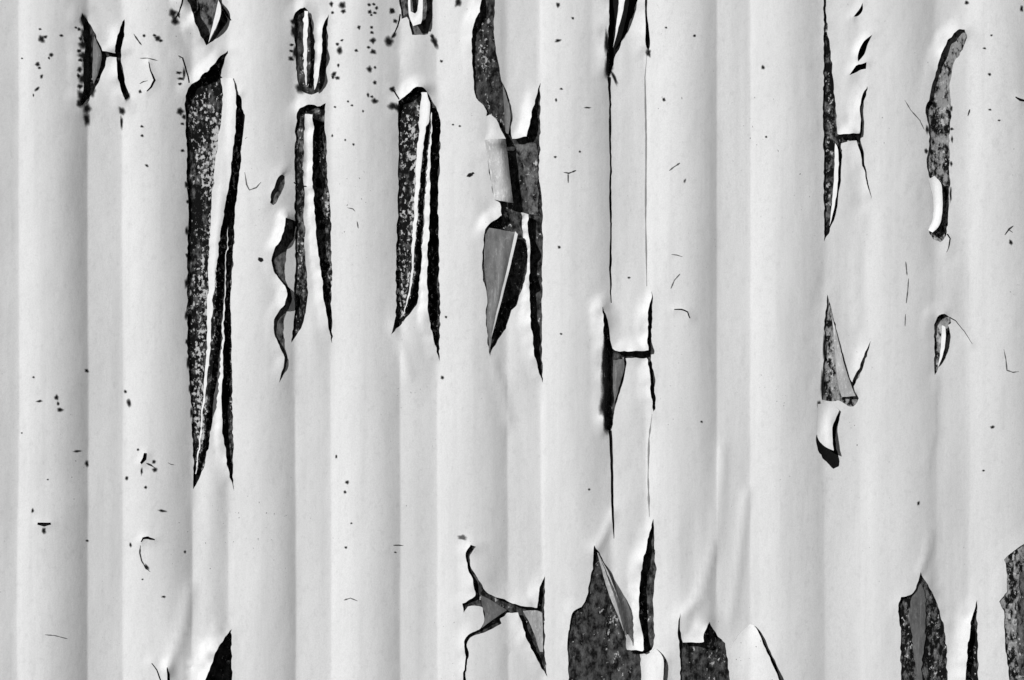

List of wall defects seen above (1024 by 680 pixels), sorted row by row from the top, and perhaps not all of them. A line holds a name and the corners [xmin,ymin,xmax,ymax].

peeling [185,51,245,489]
peeling [258,7,333,380]
peeling [392,87,441,360]
peeling [471,0,543,382]
crack [606,74,614,303]
peeling [823,0,872,240]
peeling [925,29,967,242]
crack [607,427,615,536]
peeling [462,545,547,680]
peeling [567,521,664,680]
peeling [678,618,730,680]
peeling [898,573,948,680]